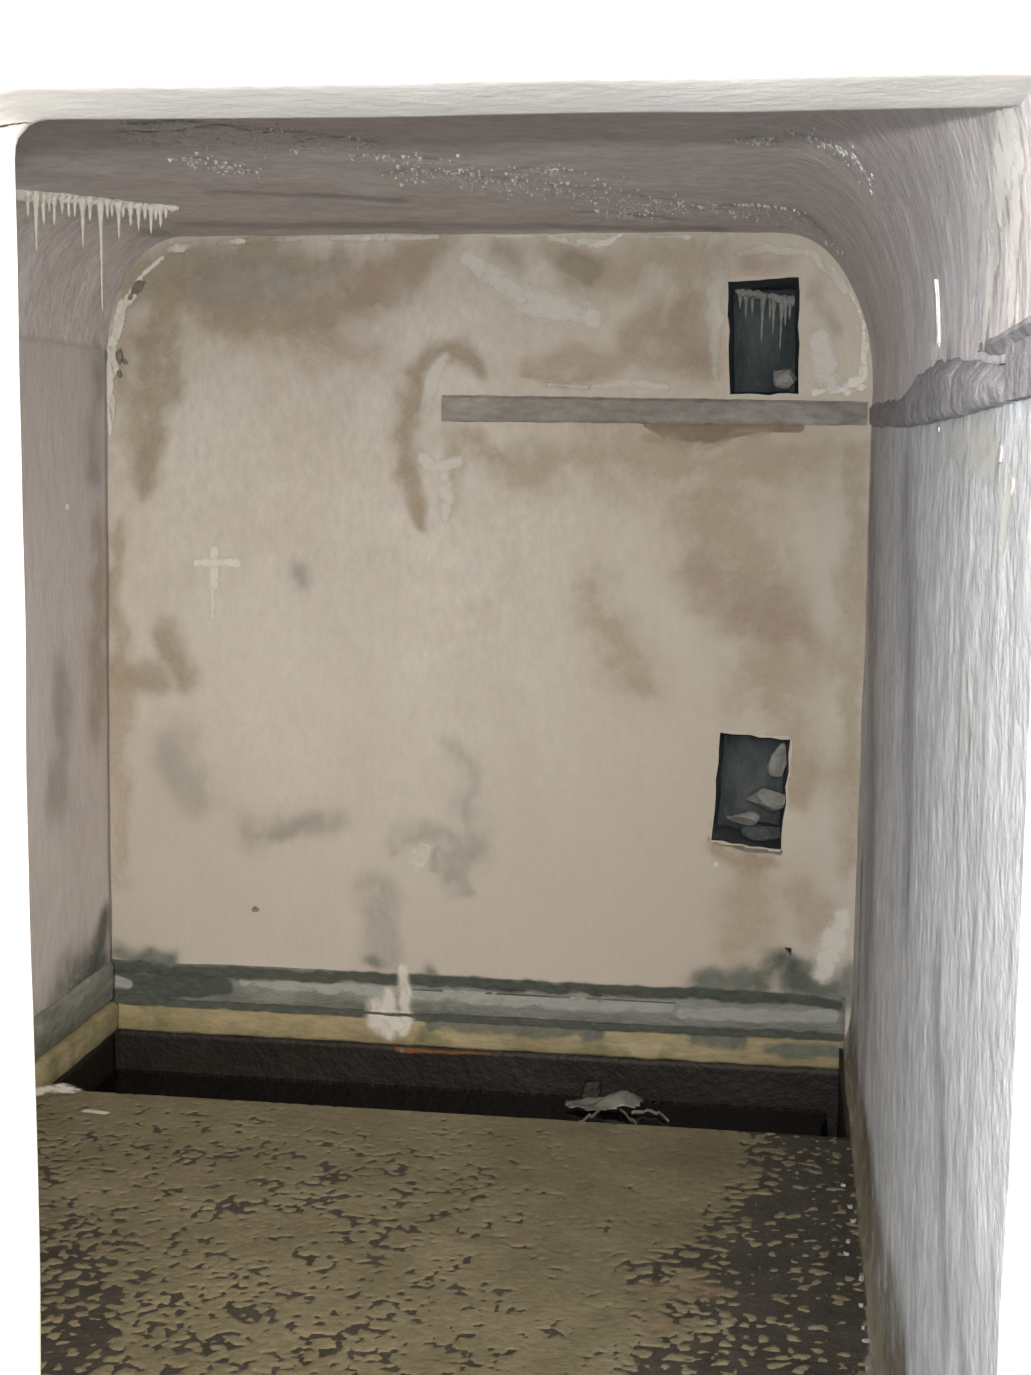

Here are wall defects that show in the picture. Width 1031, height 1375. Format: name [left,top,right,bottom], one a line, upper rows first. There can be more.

damp [125,239,433,348]
damp [460,251,601,330]
damp [495,233,630,284]
damp [639,233,869,396]
damp [400,345,483,527]
damp [644,423,804,446]
damp [859,487,875,990]
damp [904,579,913,902]
damp [368,965,412,1039]